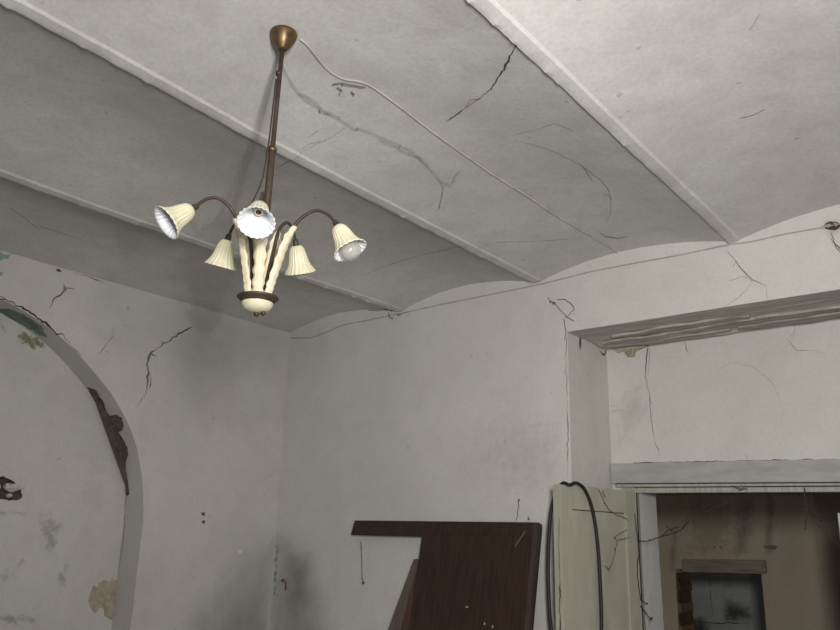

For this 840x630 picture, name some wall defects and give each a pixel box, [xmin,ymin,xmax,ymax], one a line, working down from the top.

crack [446,45,517,122]
crack [515,123,628,239]
crack [725,251,768,306]
crack [139,327,191,403]
spalling [87,387,129,496]
crack [562,337,570,472]
crack [639,345,715,463]
spalling [0,476,25,501]
peeling [88,580,117,620]